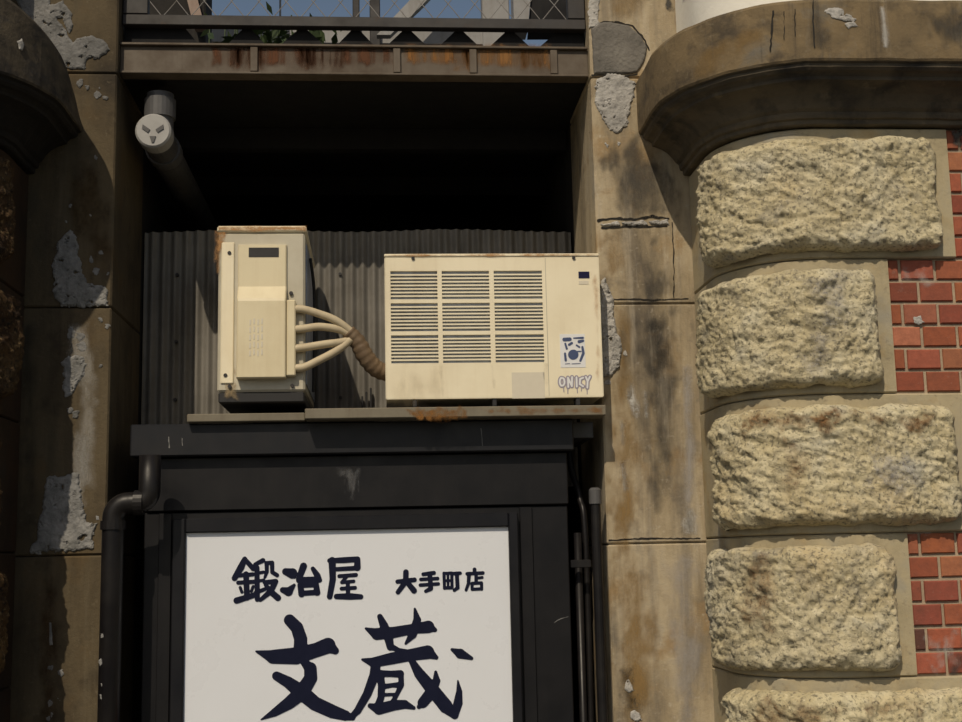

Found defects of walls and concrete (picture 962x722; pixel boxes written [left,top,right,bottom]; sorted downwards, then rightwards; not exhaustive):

peeling [16,0,110,100]
rust [212,47,323,69]
rust [407,49,469,67]
peeling [594,73,636,148]
damp [609,141,658,211]
peeling [51,220,111,329]
peeling [61,327,87,419]
peeling [600,278,627,385]
peeling [30,472,99,555]
damp [614,426,632,532]
damp [625,614,653,711]